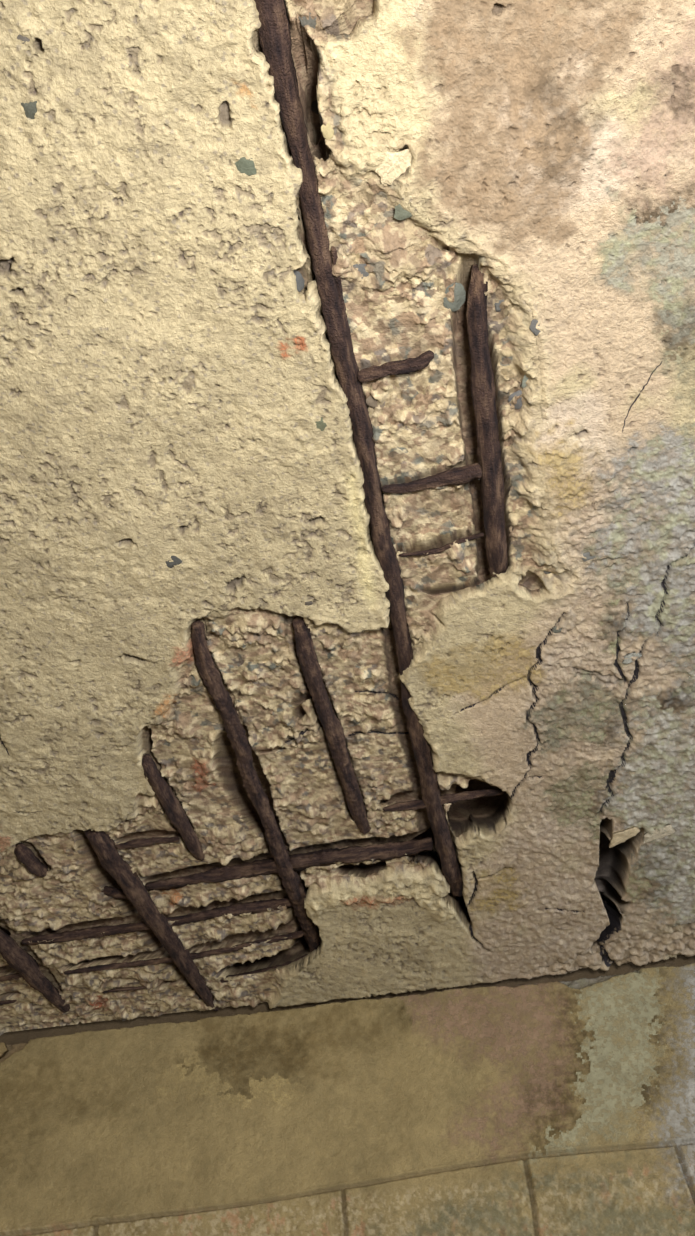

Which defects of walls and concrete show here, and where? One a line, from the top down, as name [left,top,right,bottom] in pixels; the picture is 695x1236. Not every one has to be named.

corrosion [280,337,306,357]
spalling [0,0,574,1063]
crack [460,612,564,800]
crack [600,554,688,812]
damp [408,972,664,1151]
flaking render [560,970,640,989]
damp [662,968,695,1184]